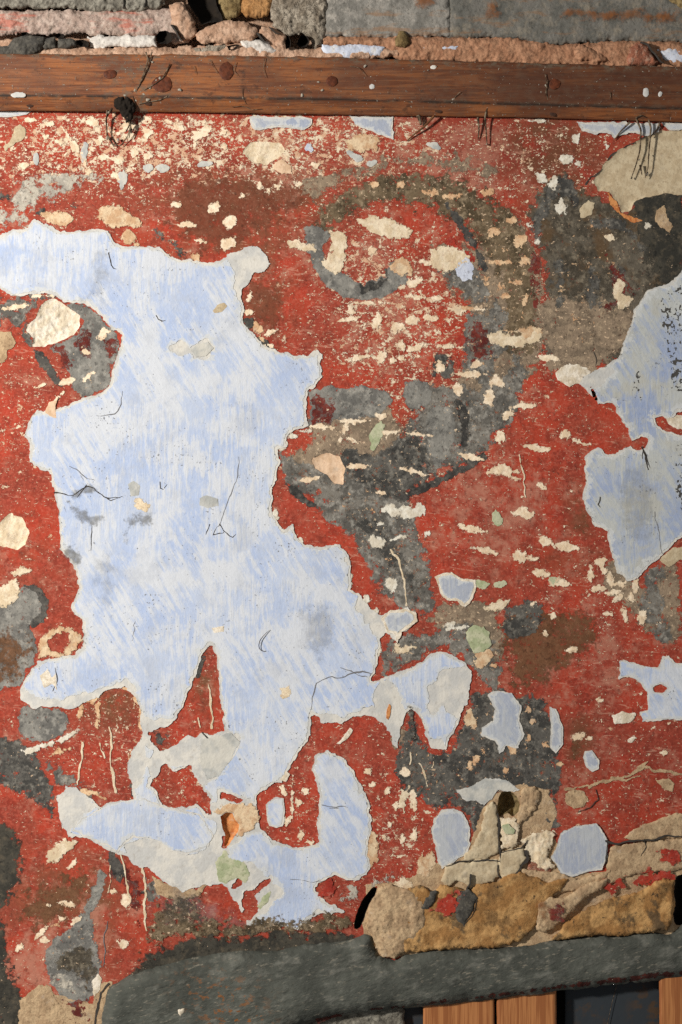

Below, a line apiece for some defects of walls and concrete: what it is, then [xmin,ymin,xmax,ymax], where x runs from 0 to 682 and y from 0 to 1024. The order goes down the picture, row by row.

spalling [534,121,682,242]
peeling [0,188,682,958]
crack [603,835,682,867]